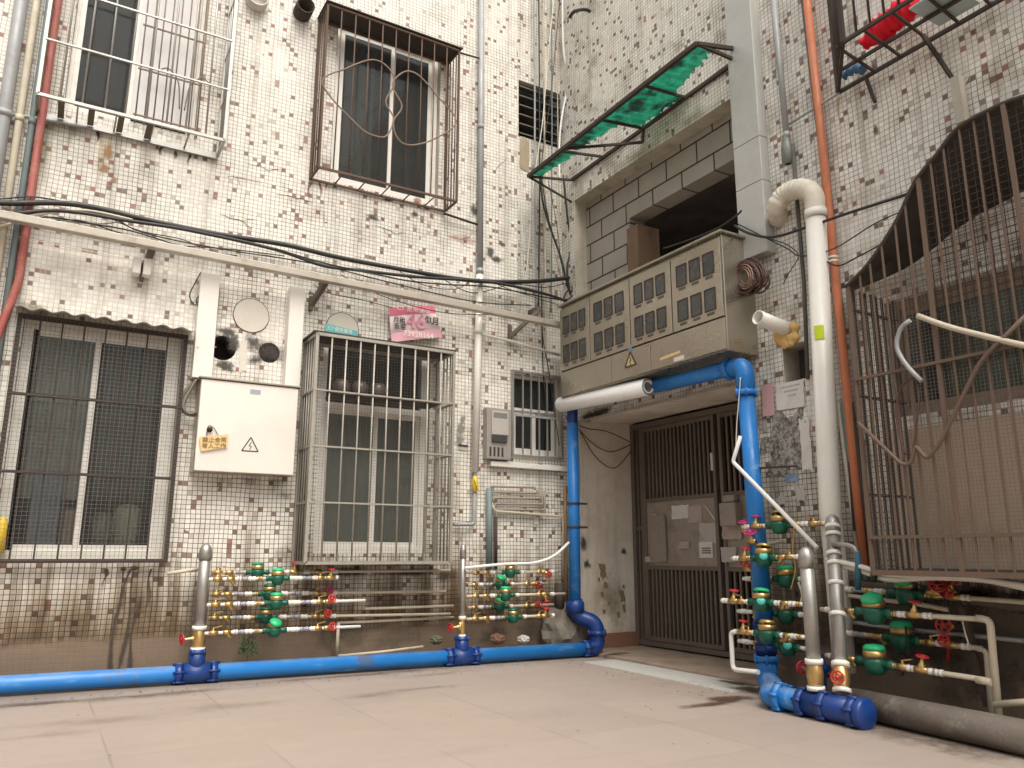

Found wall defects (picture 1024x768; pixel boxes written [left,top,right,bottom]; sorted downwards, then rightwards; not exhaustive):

rust [100,145,117,182]
flaking render [760,406,807,505]
damp [102,566,152,669]